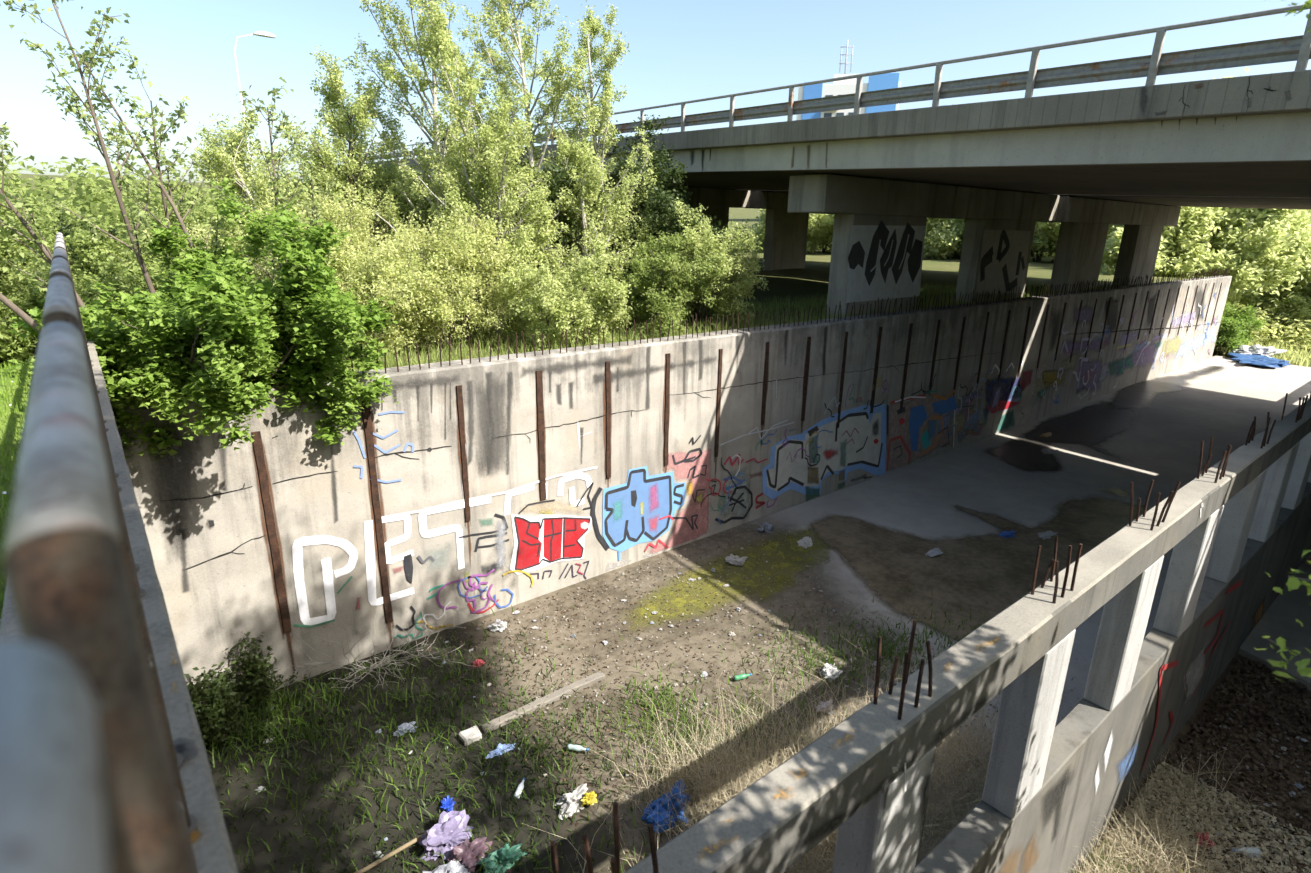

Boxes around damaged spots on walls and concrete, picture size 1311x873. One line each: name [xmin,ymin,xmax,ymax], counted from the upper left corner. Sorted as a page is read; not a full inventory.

crack [186,535,266,570]
crack [163,471,338,501]
corrosion [253,448,294,669]
corrosion [362,408,394,646]
corrosion [456,404,469,499]
leakage [365,340,712,474]
corrosion [536,401,546,514]
corrosion [603,371,612,488]